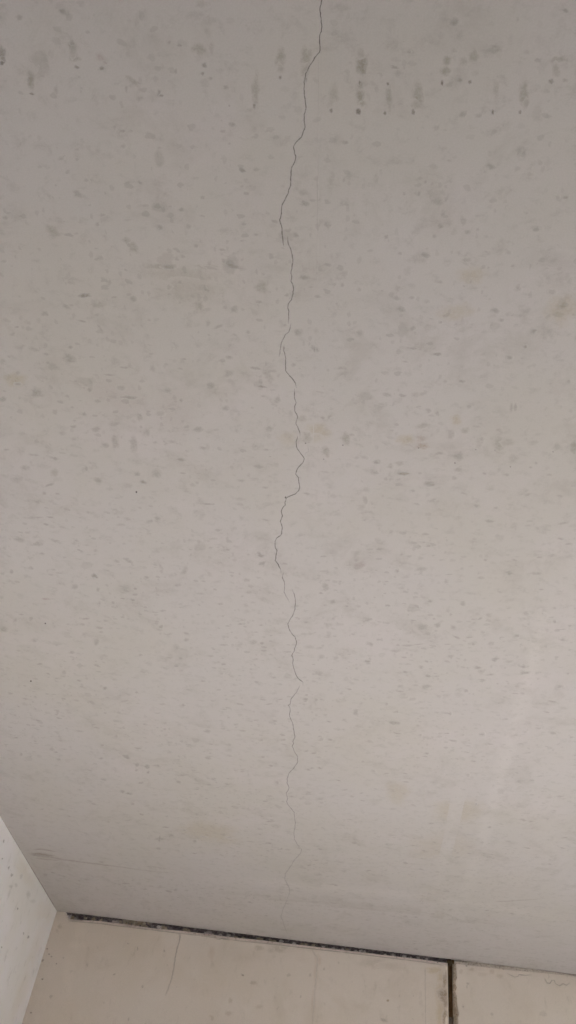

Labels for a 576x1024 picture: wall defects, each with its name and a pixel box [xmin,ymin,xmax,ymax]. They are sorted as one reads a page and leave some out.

crack [0,0,444,996]